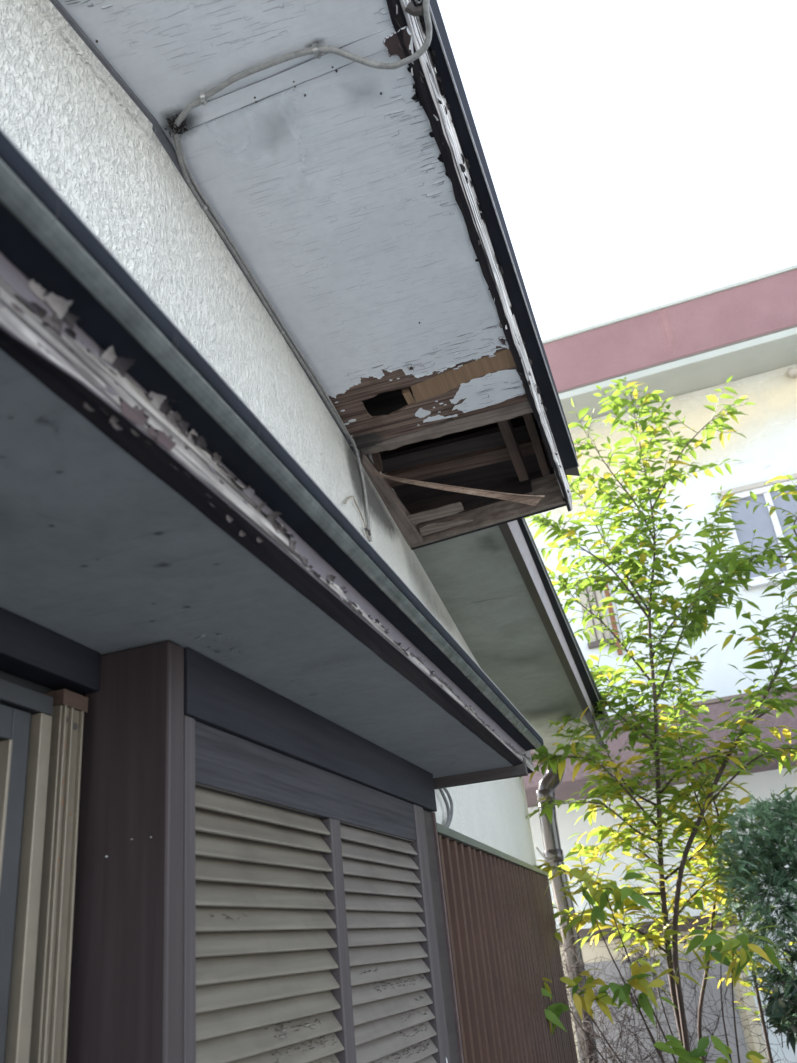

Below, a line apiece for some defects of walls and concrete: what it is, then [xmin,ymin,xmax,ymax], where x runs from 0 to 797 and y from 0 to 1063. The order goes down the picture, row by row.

peeling [383,0,454,138]
peeling [459,154,473,187]
peeling [0,276,547,772]